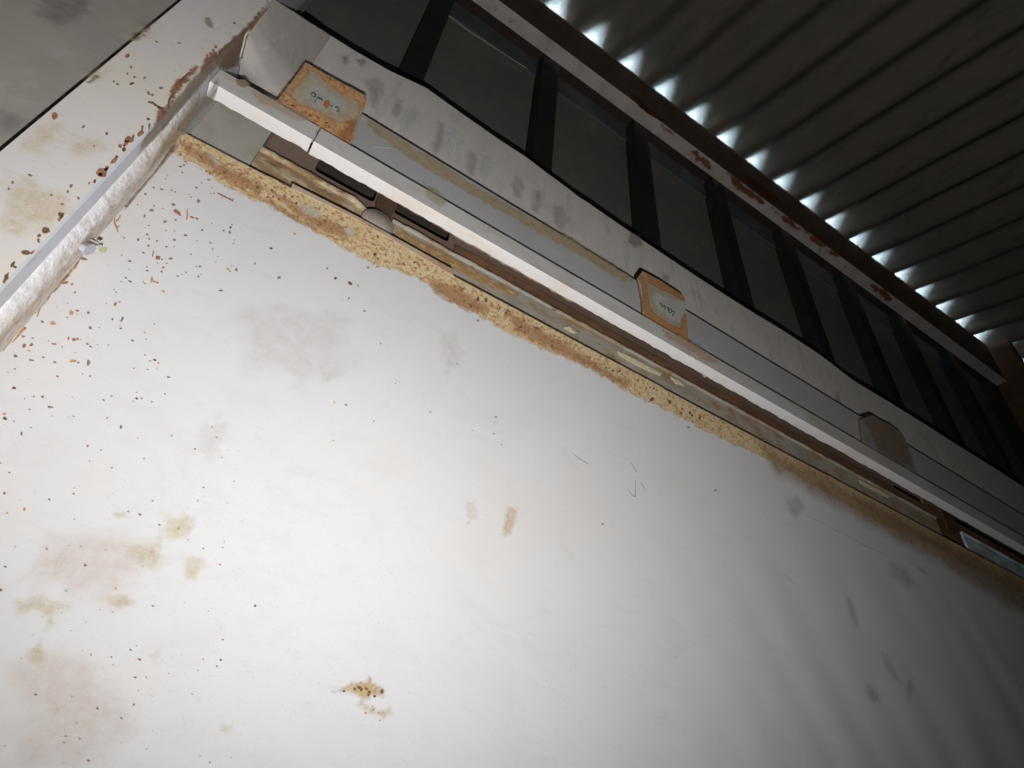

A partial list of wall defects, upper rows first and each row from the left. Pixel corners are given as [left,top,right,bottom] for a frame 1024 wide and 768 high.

corrosion [148,8,268,122]
corrosion [4,257,100,377]
corrosion [106,64,1024,612]
peeling [617,351,684,386]